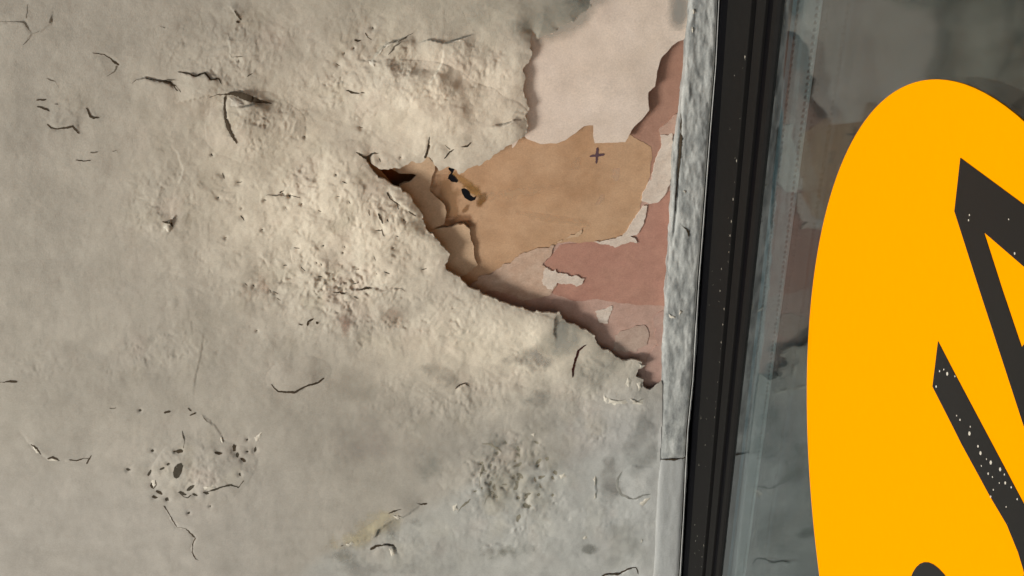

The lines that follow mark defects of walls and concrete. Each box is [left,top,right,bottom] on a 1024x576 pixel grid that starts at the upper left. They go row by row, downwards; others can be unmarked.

crack [0,4,52,45]
crack [94,11,272,144]
crack [37,79,116,162]
flaking render [364,0,696,405]
crack [271,378,324,394]
crack [572,345,586,377]
crack [31,444,91,464]
crack [164,506,197,560]